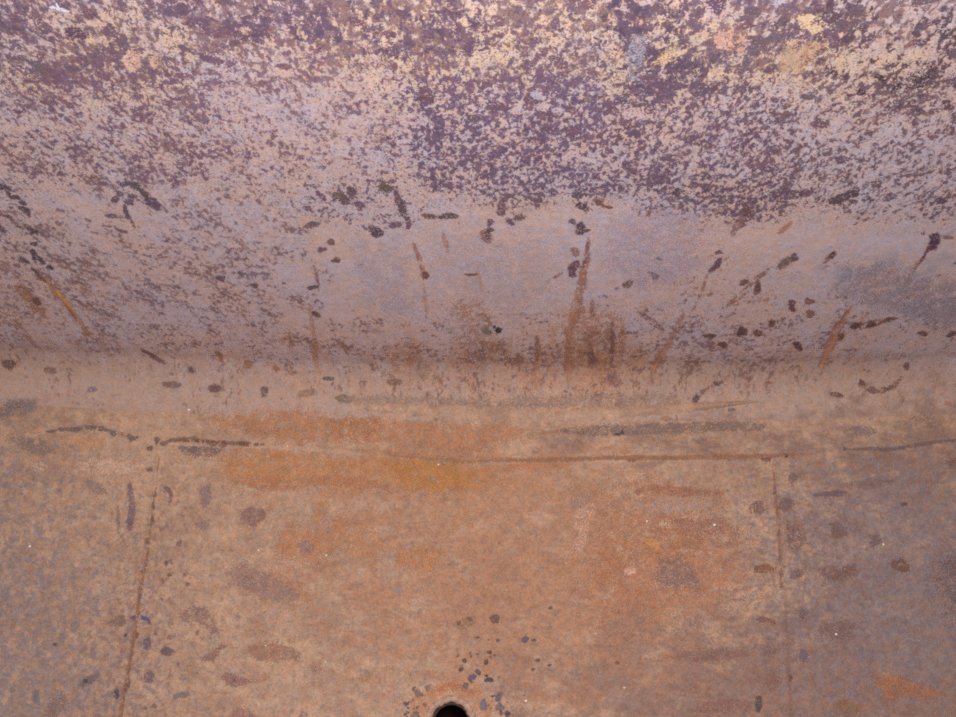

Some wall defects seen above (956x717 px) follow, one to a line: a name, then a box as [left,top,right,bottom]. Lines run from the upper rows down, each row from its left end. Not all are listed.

rust [13,286,49,319]
rust [30,267,91,339]
rust [307,303,334,381]
rust [411,242,430,321]
rust [445,266,504,380]
rust [554,218,632,394]
rust [819,306,907,368]
rust [691,380,723,403]
rust [166,386,803,583]
rust [403,617,511,717]